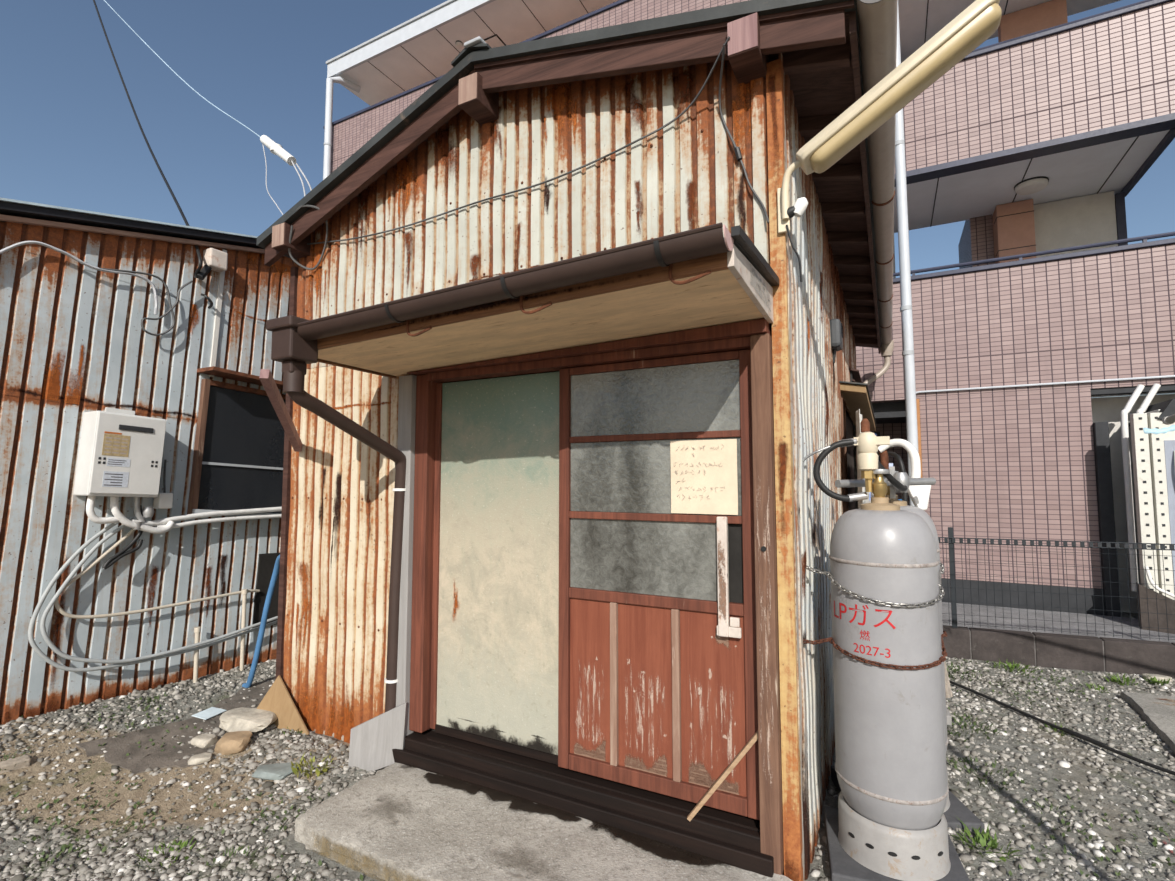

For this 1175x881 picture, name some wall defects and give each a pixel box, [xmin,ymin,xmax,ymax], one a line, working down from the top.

corrosion [687,182,695,230]
corrosion [319,467,342,561]
corrosion [779,443,787,509]
corrosion [53,559,70,676]
corrosion [296,563,311,646]
peeling [711,635,737,648]
corrosion [297,690,354,744]
water stain [449,719,553,754]
peeling [574,657,606,762]
peeling [625,659,667,777]
peeling [689,668,739,795]
corrosion [785,741,819,881]